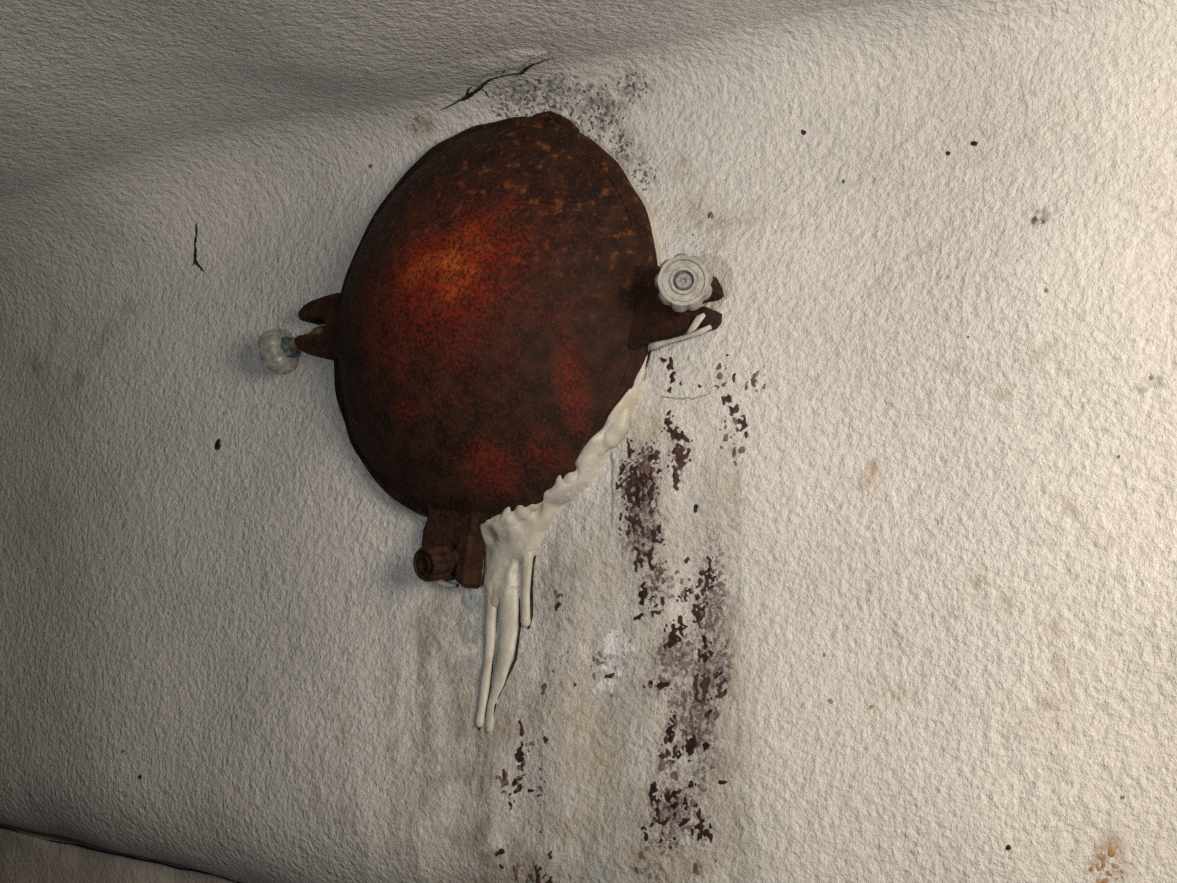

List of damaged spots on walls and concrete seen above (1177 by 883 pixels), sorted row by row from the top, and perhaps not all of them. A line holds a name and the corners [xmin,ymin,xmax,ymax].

crack [440,48,554,110]
damp [488,71,656,191]
damp [469,818,554,883]